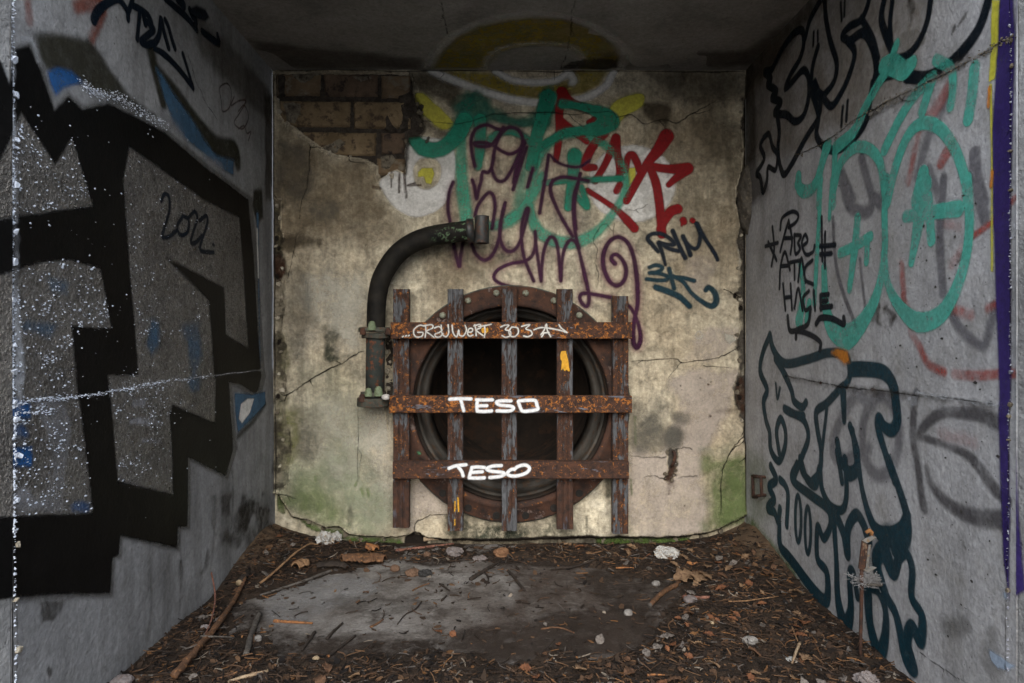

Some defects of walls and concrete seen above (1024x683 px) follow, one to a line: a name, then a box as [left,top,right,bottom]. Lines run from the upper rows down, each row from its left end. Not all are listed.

spalling [275,73,430,198]
crack [283,351,362,401]
peeling [273,204,747,545]
crack [638,348,737,374]
water stain [635,414,684,452]